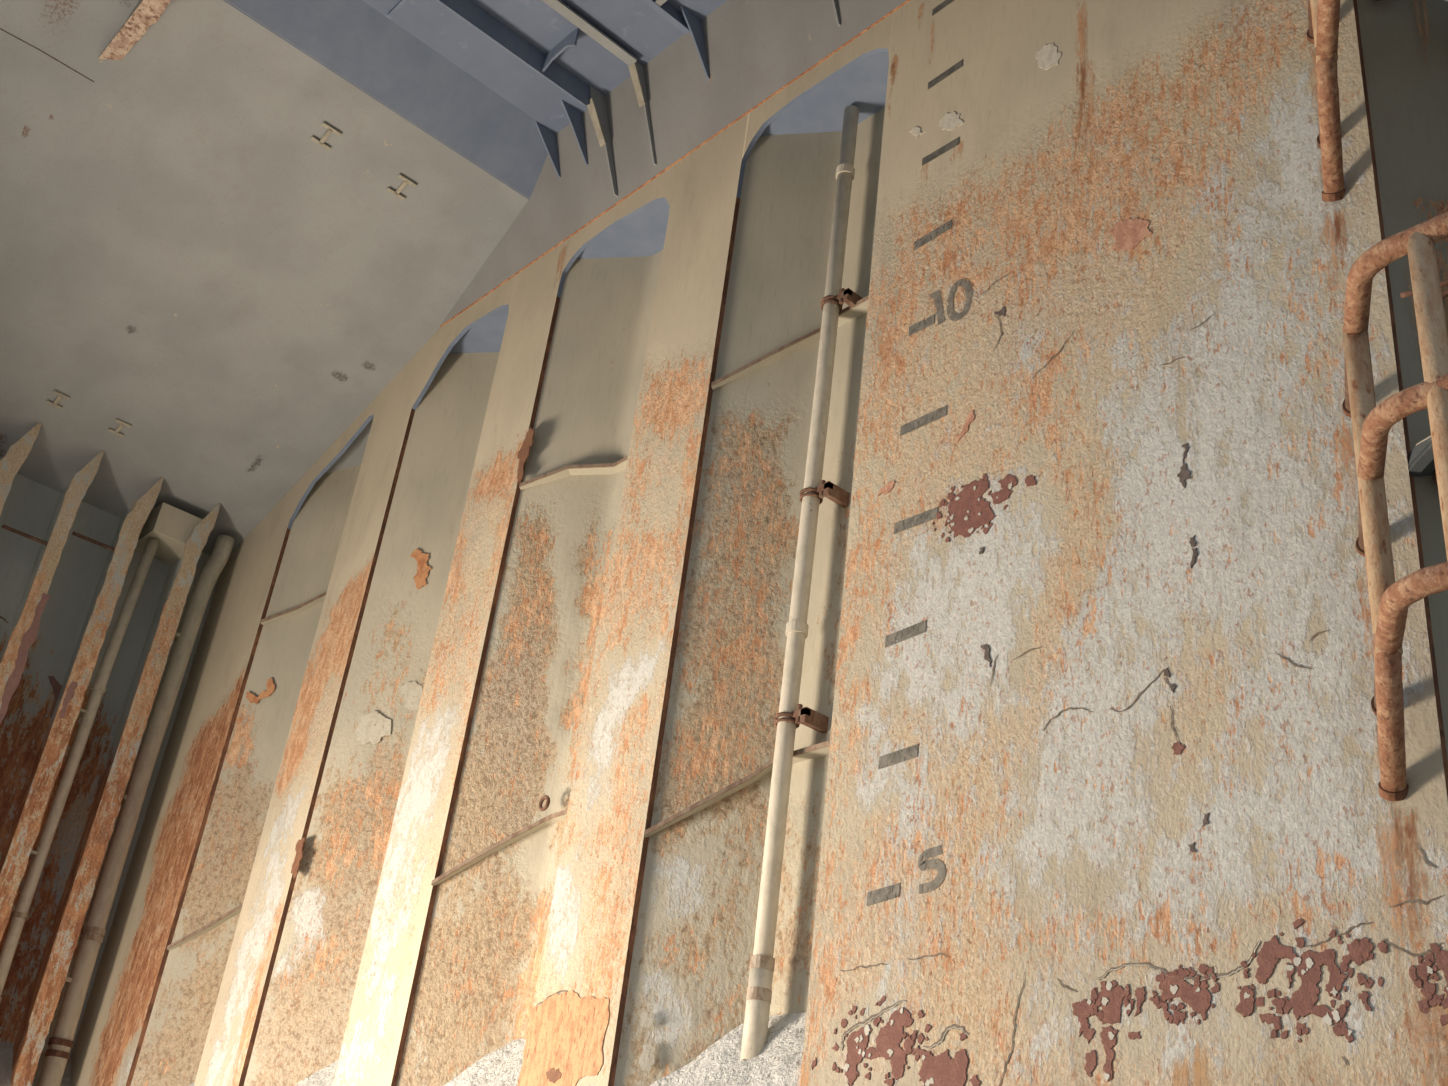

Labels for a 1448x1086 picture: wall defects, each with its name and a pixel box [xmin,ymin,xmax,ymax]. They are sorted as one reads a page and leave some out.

rust [1076,9,1094,136]
rust [1324,212,1346,304]
rust [956,409,975,442]
peeling [932,473,1036,554]
rust [410,549,431,589]
crack [990,647,1041,685]
crack [1042,671,1178,742]
rust [291,838,306,879]
peeling [517,990,610,1086]
peeling [811,995,981,1086]
peeling [1072,964,1220,1082]
peeling [1236,919,1388,1043]